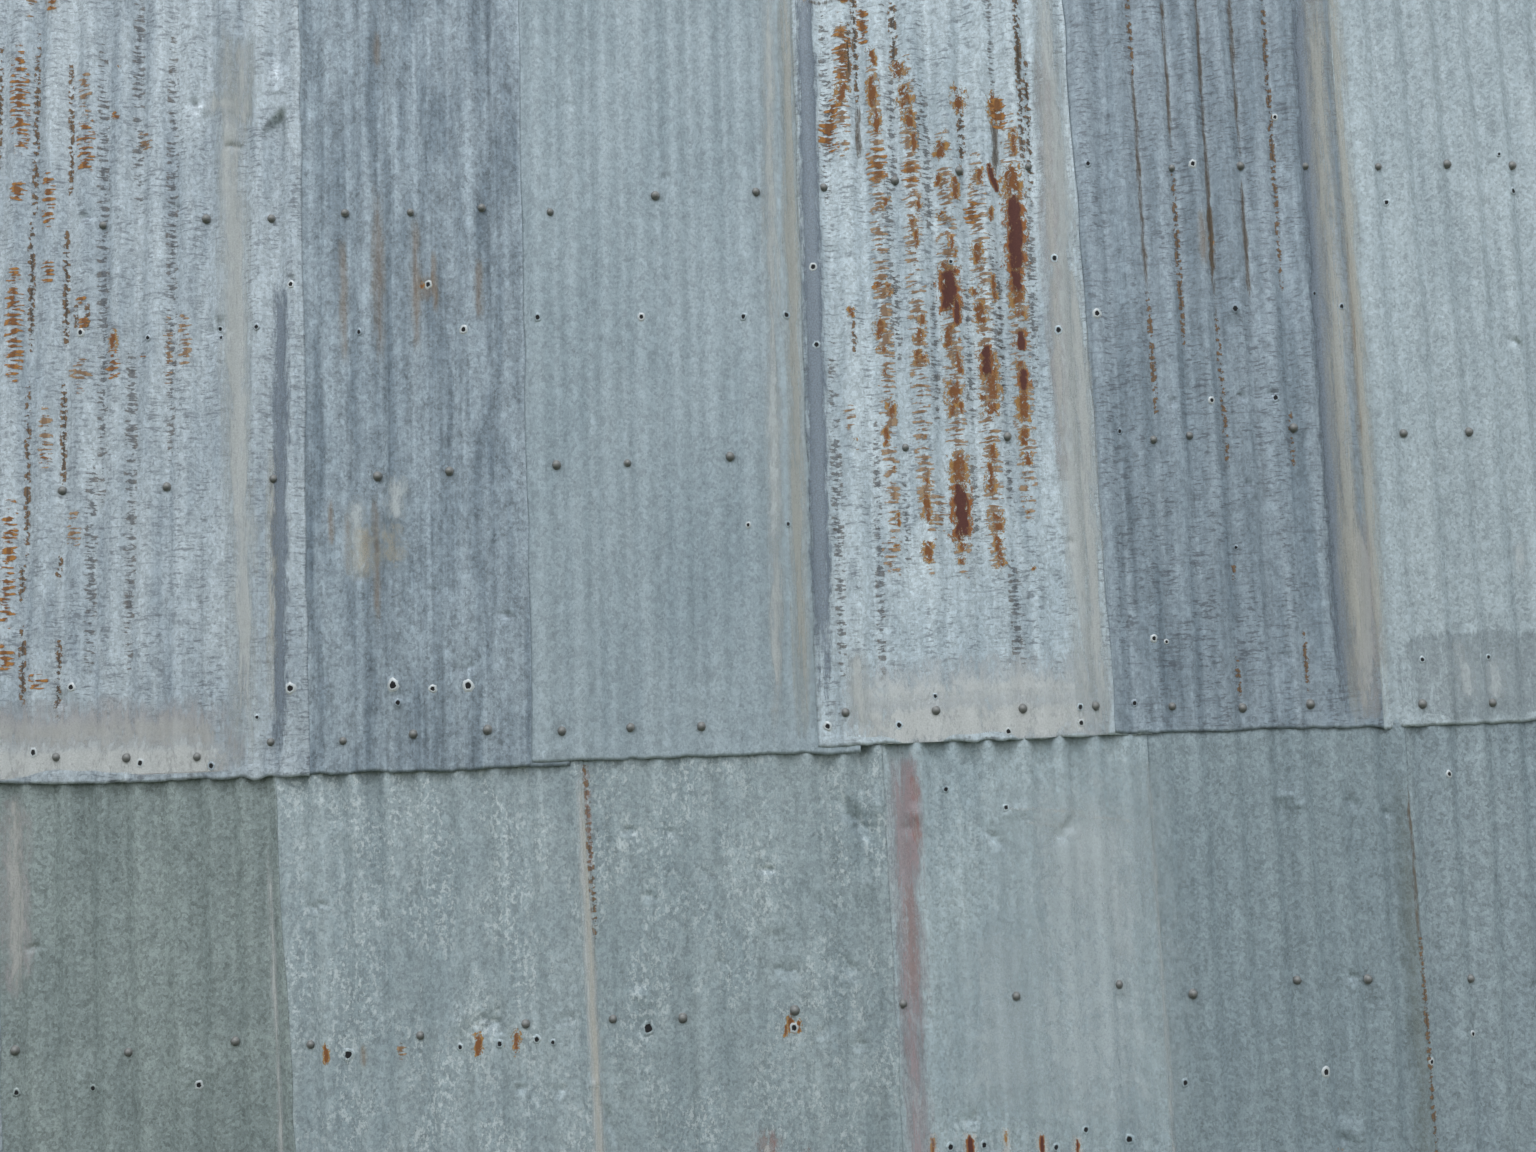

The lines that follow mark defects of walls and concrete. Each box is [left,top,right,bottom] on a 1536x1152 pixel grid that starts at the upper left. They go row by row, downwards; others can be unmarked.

rust [803,0,1038,578]
rust [0,0,120,717]
rust [163,314,192,384]
rust [322,1042,330,1065]
rust [471,1031,484,1059]
rust [504,1028,522,1057]
rust [963,1133,979,1152]
rust [1035,1131,1049,1152]